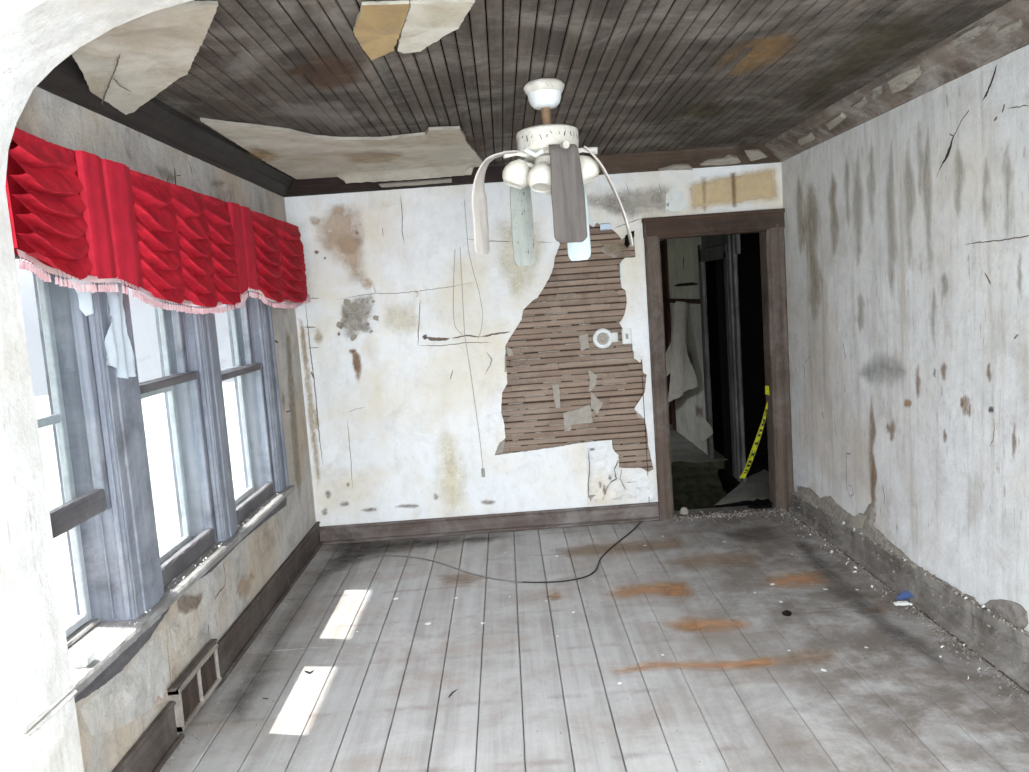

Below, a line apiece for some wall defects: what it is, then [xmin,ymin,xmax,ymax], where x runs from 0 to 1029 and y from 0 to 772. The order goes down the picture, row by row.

crack [101,55,130,104]
crack [937,65,1028,175]
crack [965,235,1029,245]
peeling [336,298,379,341]
flaking render [418,218,653,471]
flaking render [797,486,925,571]
flaking render [959,591,1029,629]